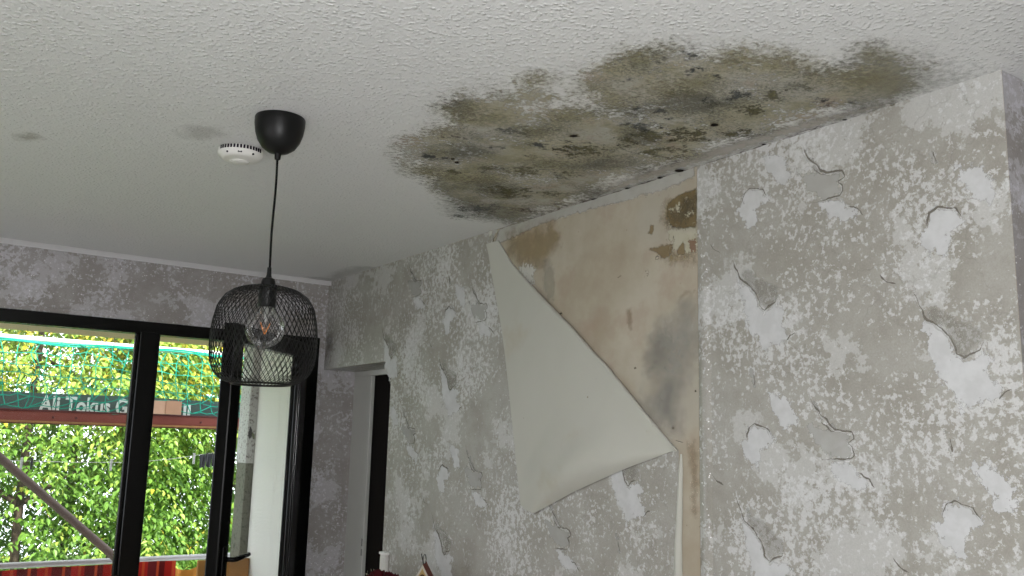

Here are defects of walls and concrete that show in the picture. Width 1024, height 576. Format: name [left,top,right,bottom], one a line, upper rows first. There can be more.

mould [391,42,935,222]
water stain [650,243,688,262]
water stain [665,189,697,228]
peeling [764,146,863,222]
peeling [920,205,965,258]
peeling [442,284,494,337]
peeling [732,260,794,351]
peeling [914,294,1012,415]
peeling [741,392,874,491]
peeling [610,470,650,527]
peeling [735,498,794,576]
peeling [931,460,1019,559]